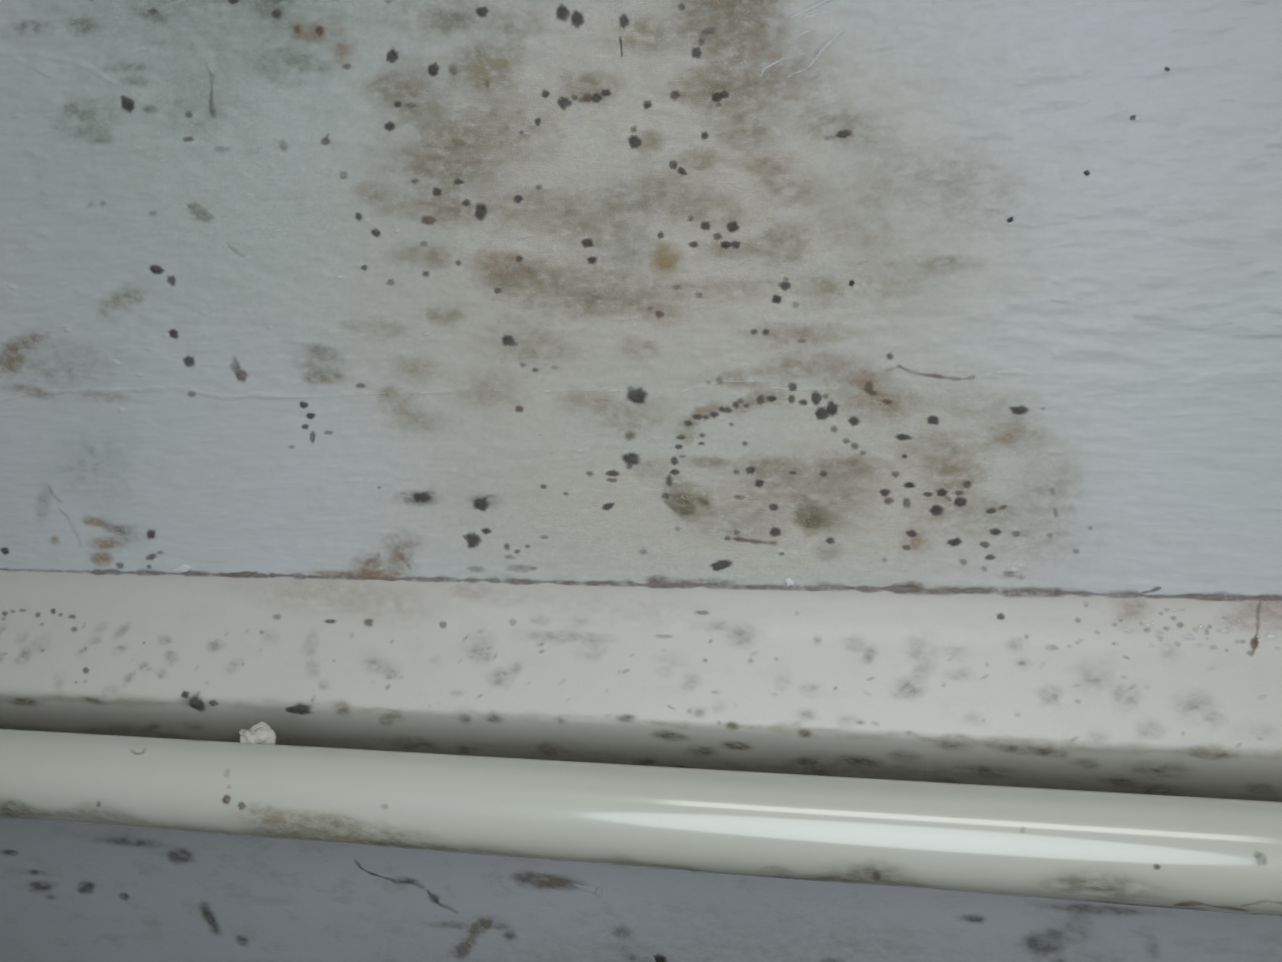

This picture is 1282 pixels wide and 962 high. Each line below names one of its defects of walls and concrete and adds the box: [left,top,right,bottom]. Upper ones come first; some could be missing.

leakage [557,6,583,26]
leakage [428,15,765,293]
leakage [773,282,790,303]
leakage [628,389,646,403]
leakage [607,454,638,482]
leakage [665,375,900,570]
leakage [881,453,970,515]
leakage [413,493,432,503]
leakage [474,499,488,510]
leakage [465,529,490,547]
leakage [182,691,217,710]
leakage [287,704,309,714]